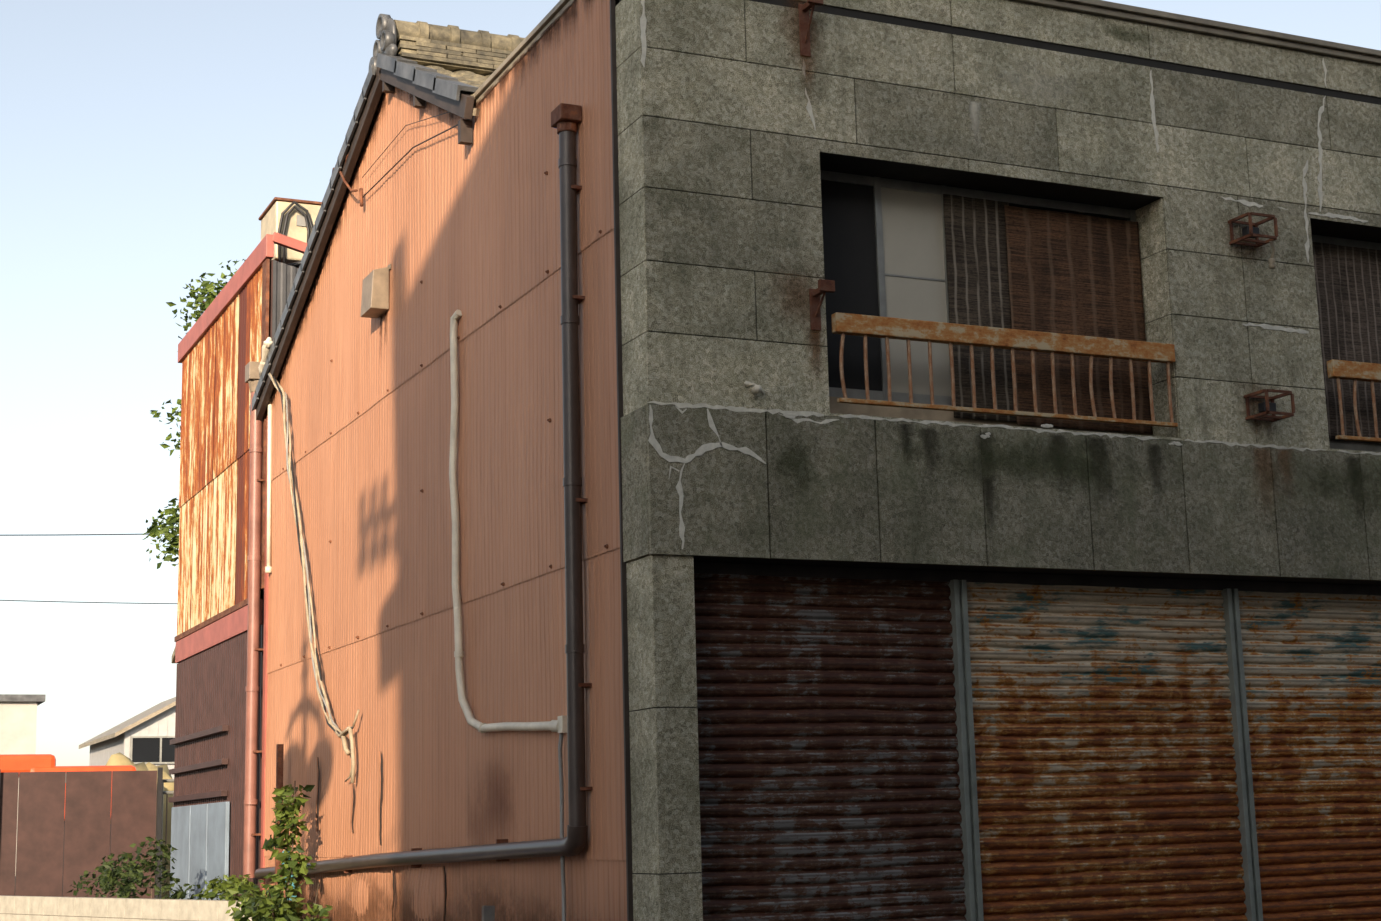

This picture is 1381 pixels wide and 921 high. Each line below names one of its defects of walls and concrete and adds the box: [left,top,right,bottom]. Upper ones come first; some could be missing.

crack [648,405,766,549]
damp [970,433,1105,500]